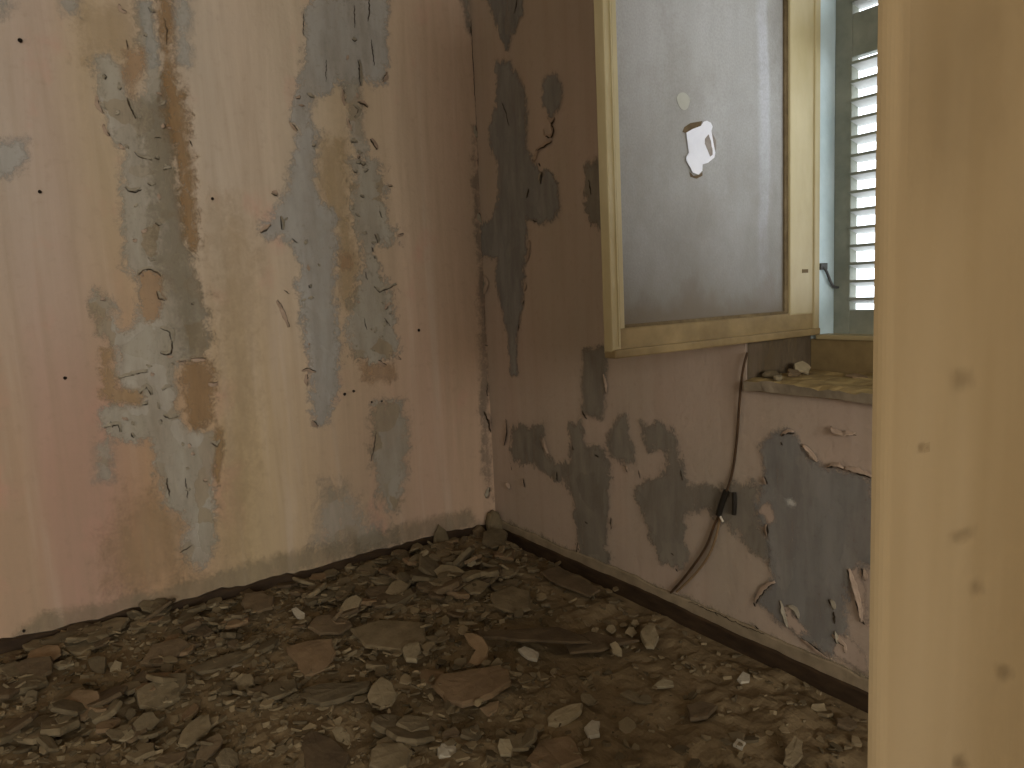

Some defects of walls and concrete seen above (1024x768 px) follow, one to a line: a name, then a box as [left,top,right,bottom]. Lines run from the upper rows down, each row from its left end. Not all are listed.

peeling [89,1,221,570]
peeling [260,0,391,427]
peeling [480,0,563,376]
peeling [503,346,872,658]